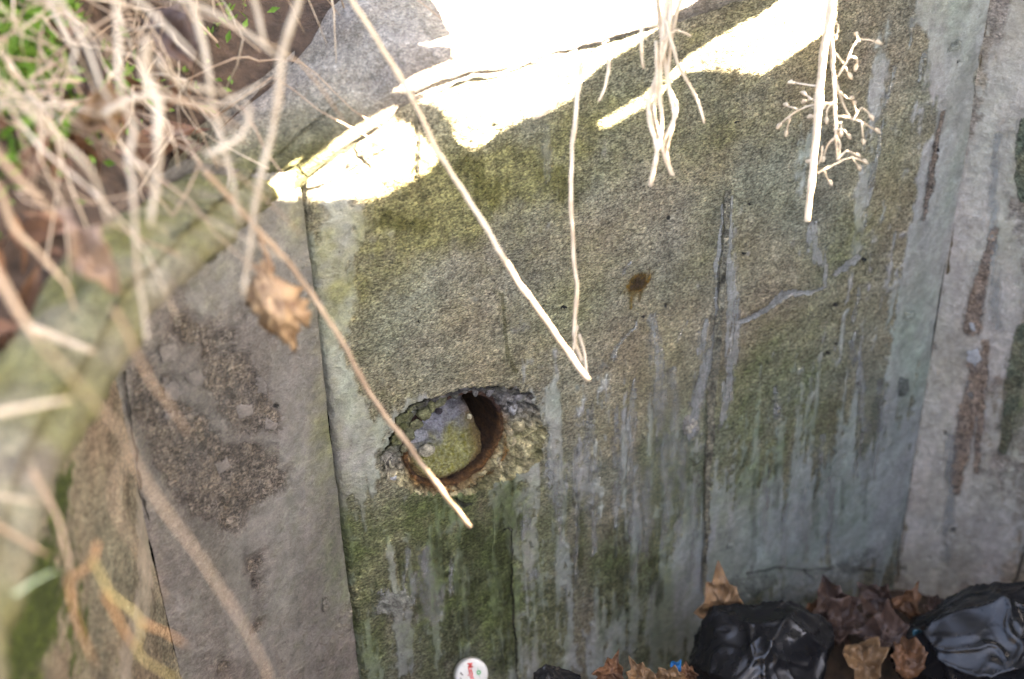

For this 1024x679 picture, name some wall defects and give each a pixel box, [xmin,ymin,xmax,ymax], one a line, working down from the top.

rust [624,270,654,310]
leakage [687,196,740,439]
rust [401,391,507,492]
spalling [377,385,547,497]